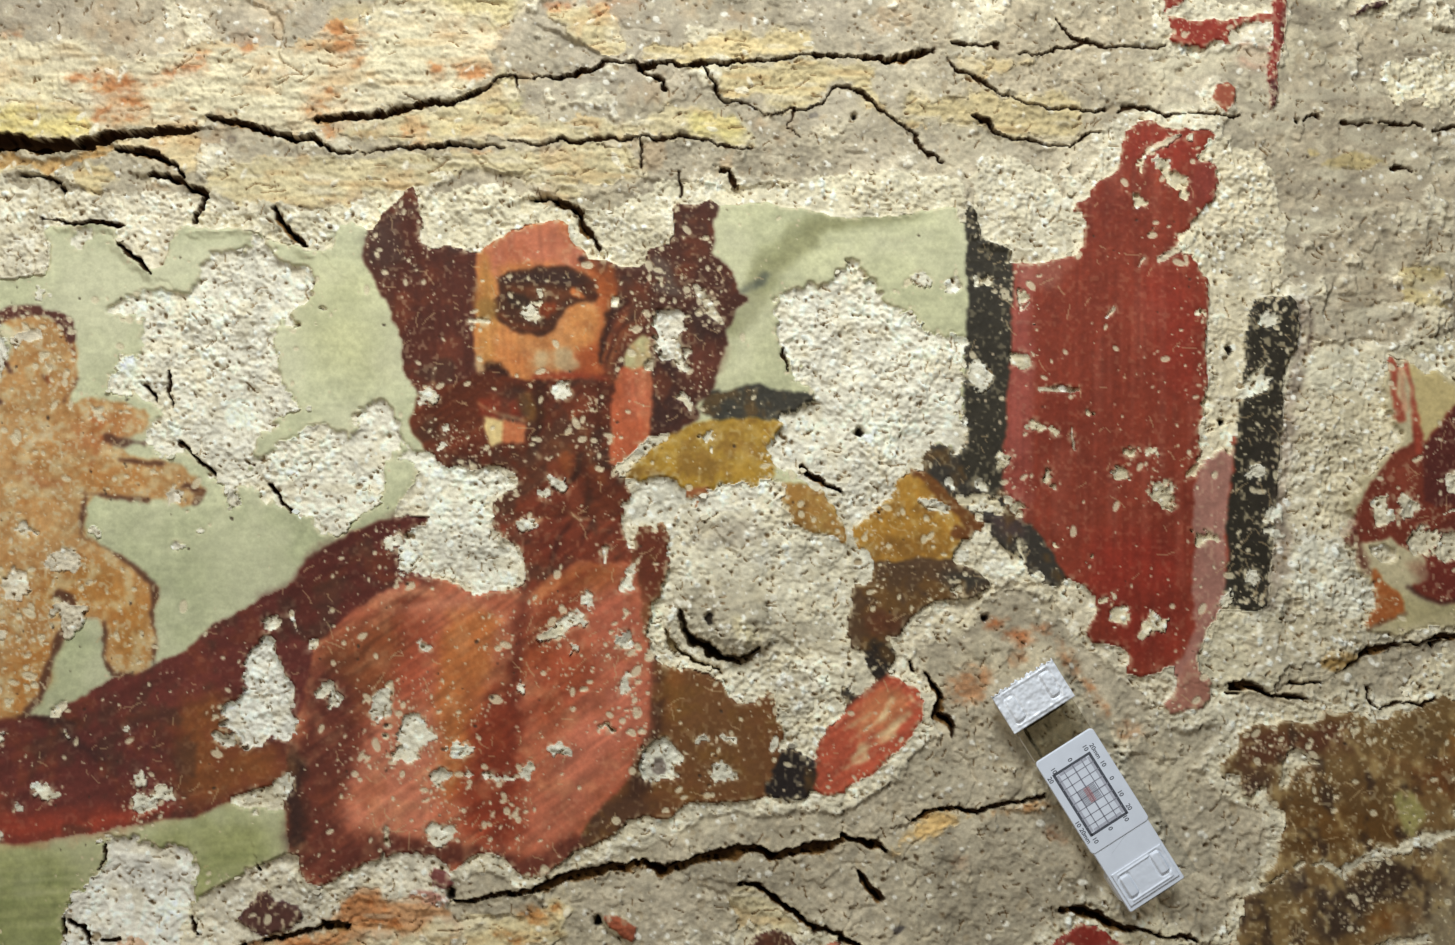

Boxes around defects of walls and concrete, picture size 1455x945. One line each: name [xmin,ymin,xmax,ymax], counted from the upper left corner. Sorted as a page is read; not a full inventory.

crack [0,18,1241,275]
spalling [0,0,1190,596]
spalling [1150,134,1288,513]
spalling [615,259,994,761]
spalling [1197,333,1455,704]
spalling [61,823,574,945]
crack [454,832,889,945]
spalling [640,733,739,784]
crack [912,793,1048,822]
spalling [888,531,1176,709]
crack [1058,905,1200,944]
crack [1224,633,1455,711]